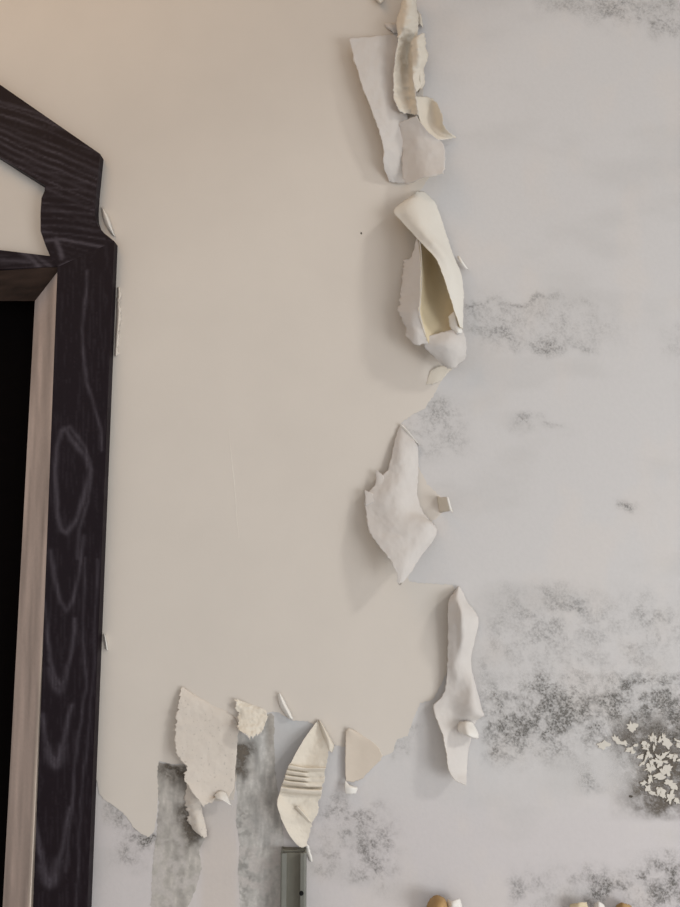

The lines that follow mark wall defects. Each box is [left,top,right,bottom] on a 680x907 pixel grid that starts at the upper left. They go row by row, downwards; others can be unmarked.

peeling [306,0,680,907]
mould [488,677,680,745]
leakage [158,764,187,781]
leakage [178,807,201,842]
peeling [92,687,334,907]